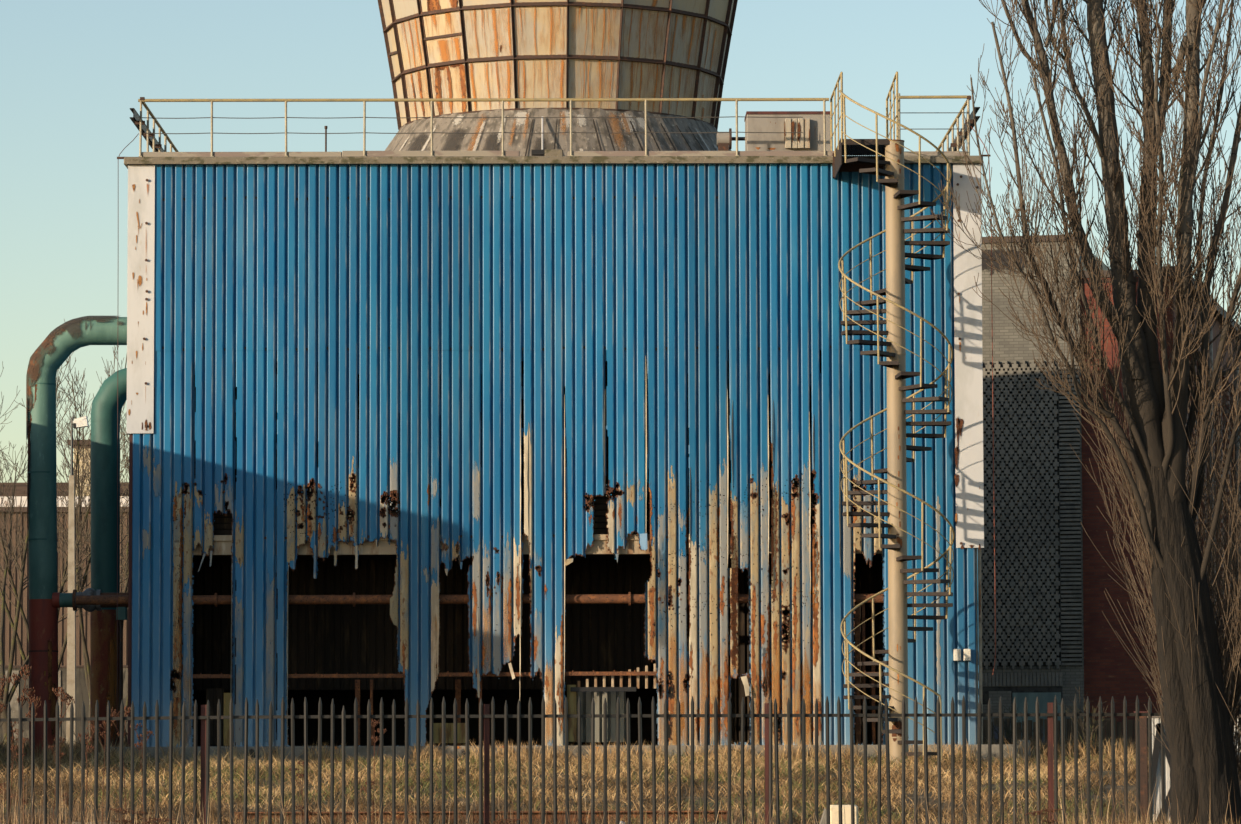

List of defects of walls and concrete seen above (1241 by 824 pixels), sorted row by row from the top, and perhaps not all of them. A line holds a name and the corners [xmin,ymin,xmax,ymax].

corrosion [396,0,726,151]
corrosion [173,482,214,738]
peeling [265,570,275,746]
peeling [287,427,564,746]
peeling [588,479,646,554]
corrosion [565,442,822,743]